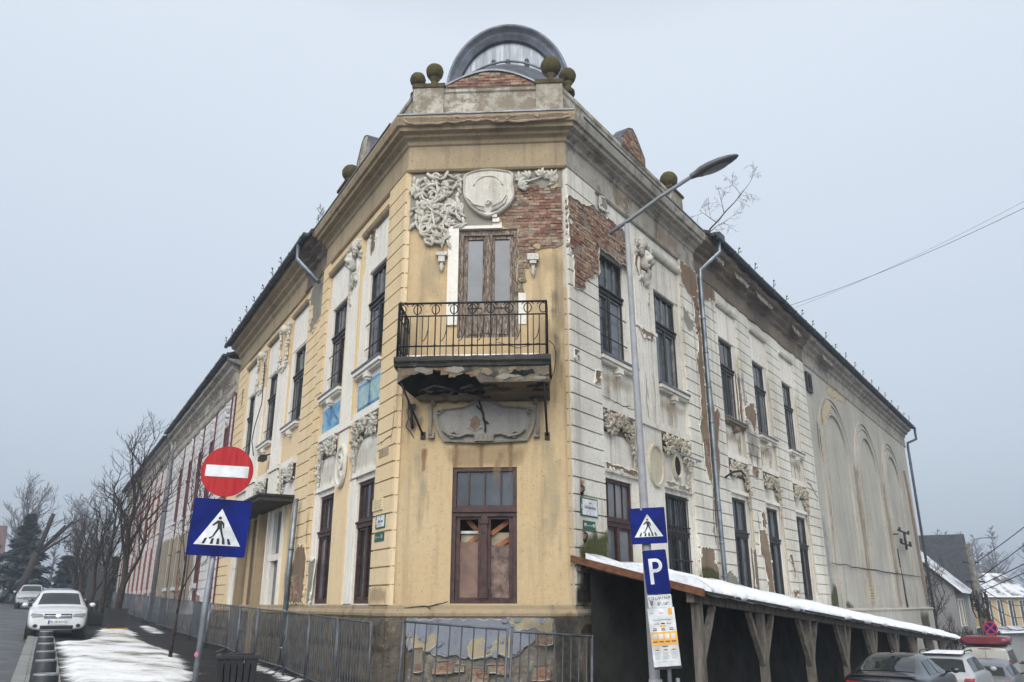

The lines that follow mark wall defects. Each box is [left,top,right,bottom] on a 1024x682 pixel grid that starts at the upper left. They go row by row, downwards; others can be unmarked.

flaking render [500,182,652,293]
spalling [401,366,550,399]
flaking render [678,259,721,535]
flaking render [736,360,775,593]
flaking render [405,617,556,682]